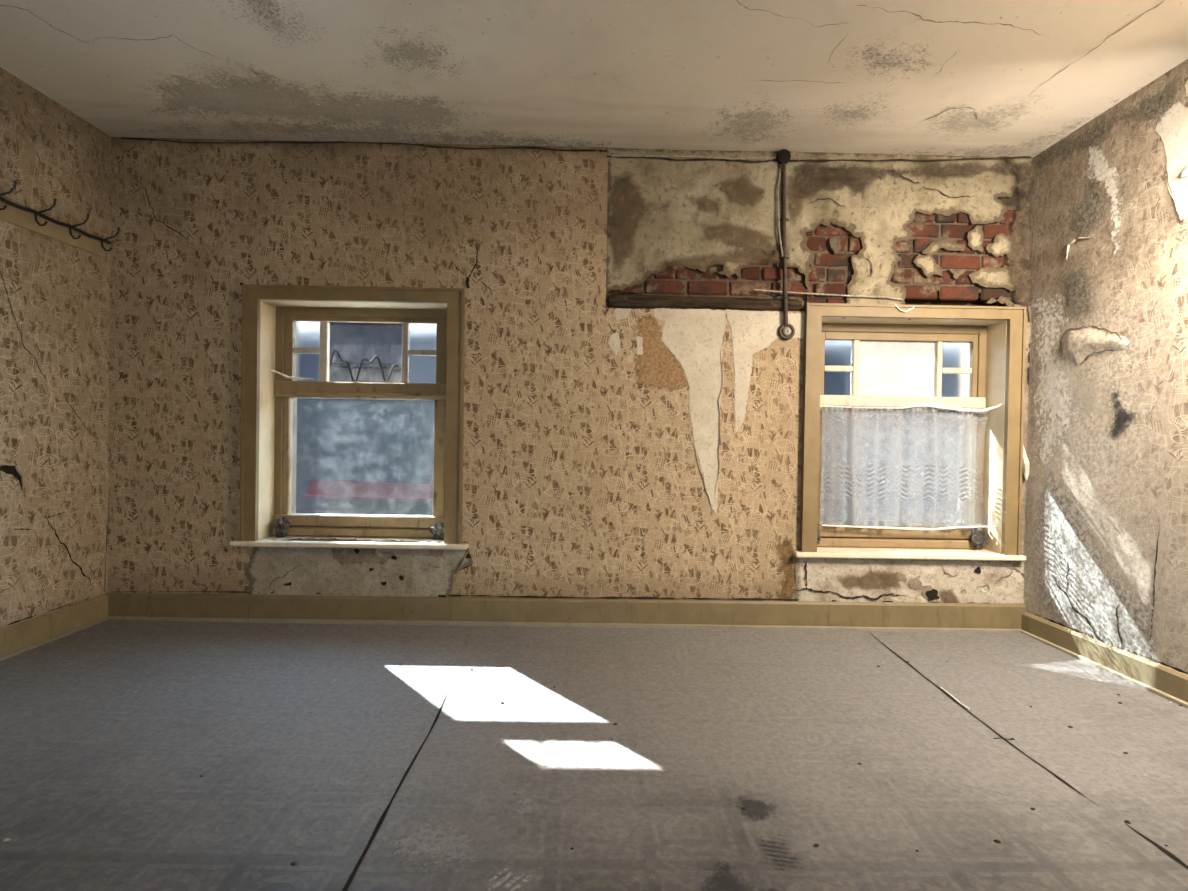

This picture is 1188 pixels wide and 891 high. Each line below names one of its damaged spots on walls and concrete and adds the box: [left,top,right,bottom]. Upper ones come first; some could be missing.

crack [737,0,1045,83]
crack [1021,1,1163,102]
crack [919,107,999,125]
leakage [659,223,788,269]
flaking render [606,148,1033,454]
leakage [789,78,1181,659]
flaking render [246,538,473,597]
crack [797,560,905,601]